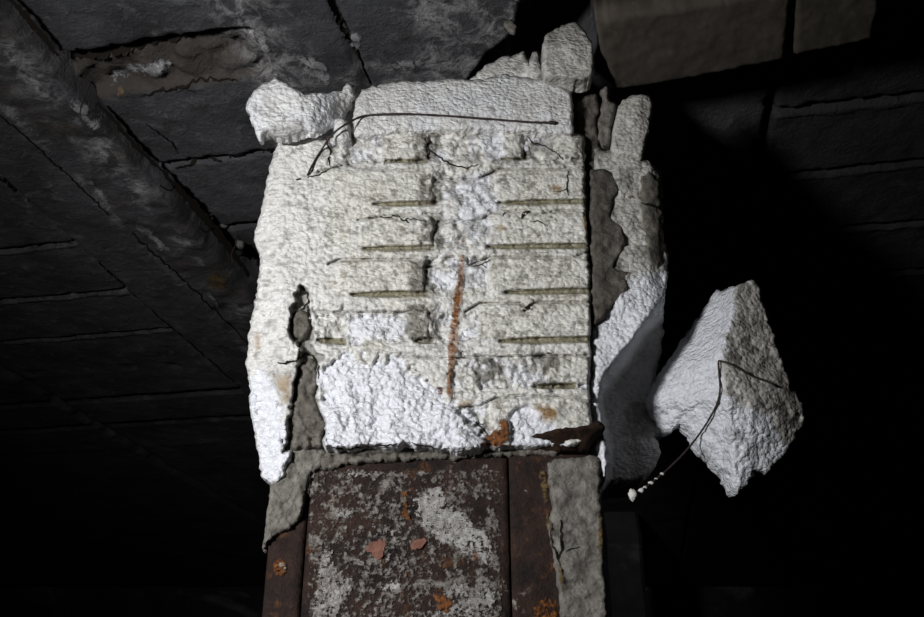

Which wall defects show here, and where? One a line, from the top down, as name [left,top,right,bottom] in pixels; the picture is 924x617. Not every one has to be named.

peeling [503,19,516,36]
spalling [112,61,171,80]
crack [97,102,274,277]
rust [436,255,464,403]
rust [480,419,510,446]
rust [410,538,427,550]
rust [274,558,286,576]